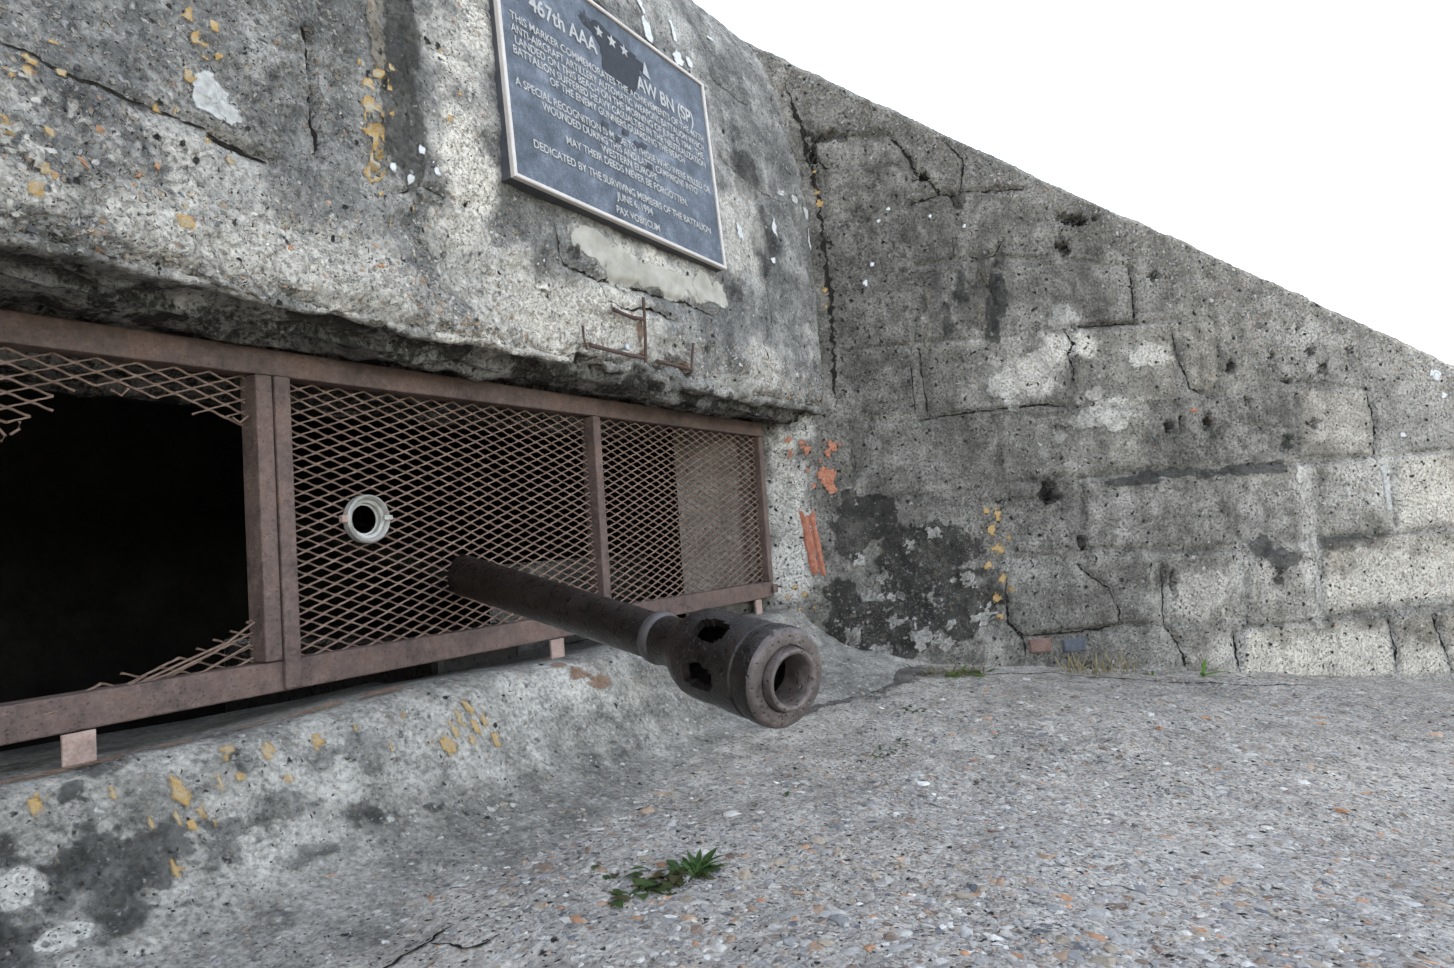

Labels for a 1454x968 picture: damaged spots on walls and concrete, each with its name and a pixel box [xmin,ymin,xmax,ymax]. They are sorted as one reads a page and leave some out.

crack [0,42,266,163]
crack [300,26,317,161]
leakage [366,0,428,203]
crack [784,78,838,408]
leakage [0,753,323,968]
leakage [229,747,263,775]
leakage [280,842,340,867]
leakage [295,727,390,828]
leakage [422,802,445,811]
crack [383,926,500,968]